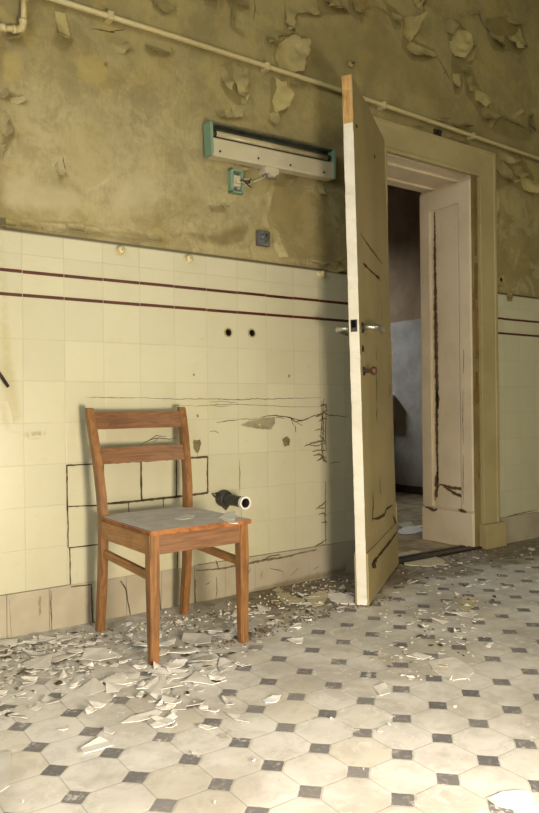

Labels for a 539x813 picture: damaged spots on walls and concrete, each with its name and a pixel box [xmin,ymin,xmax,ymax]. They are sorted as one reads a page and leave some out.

peeling [1,31,26,48]
peeling [49,10,75,55]
peeling [105,40,179,66]
peeling [201,0,251,35]
peeling [0,88,31,167]
peeling [215,58,249,124]
peeling [265,0,539,236]
peeling [0,216,171,247]
peeling [262,173,337,265]
spalling [238,416,276,430]
crack [66,435,209,622]
crack [143,397,344,603]